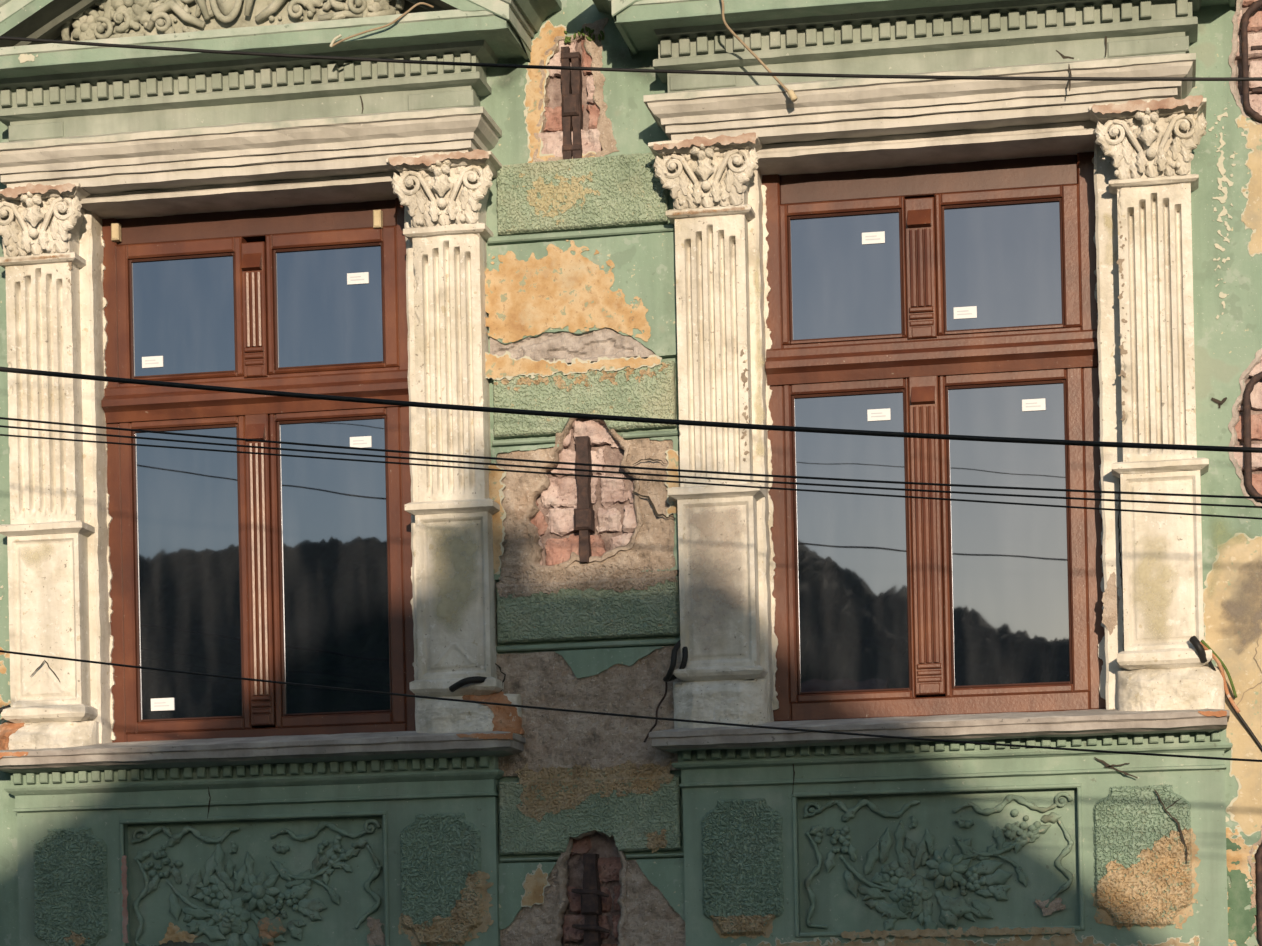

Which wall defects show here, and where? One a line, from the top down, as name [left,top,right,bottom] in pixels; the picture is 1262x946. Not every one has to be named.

spalling [519,17,619,225]
peeling [1091,95,1203,115]
spalling [1208,0,1262,331]
peeling [485,240,670,392]
spalling [1228,348,1262,506]
spalling [489,418,680,599]
spalling [0,647,29,759]
spalling [456,646,682,822]
peeling [1198,533,1262,946]
crack [1237,636,1262,705]
spalling [367,829,686,946]
peeling [710,828,1201,946]